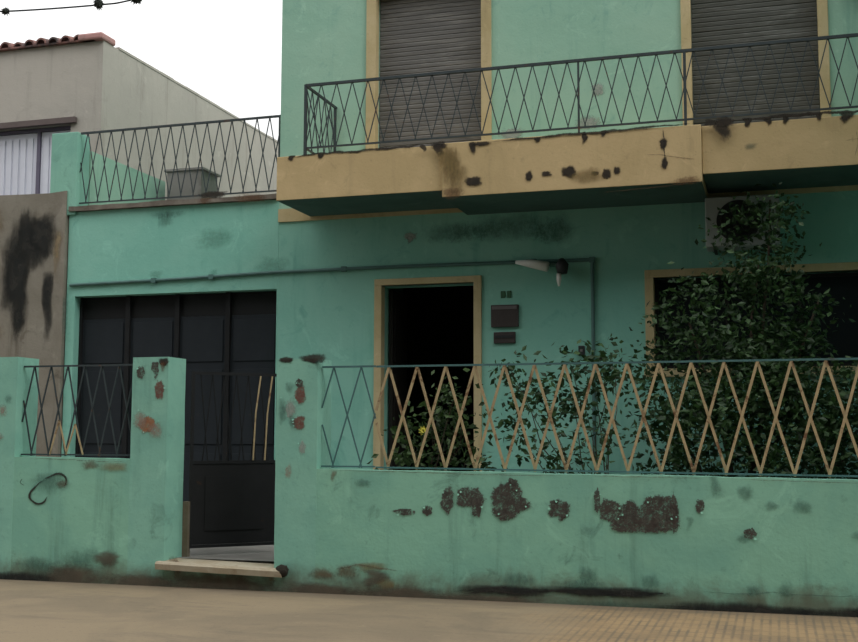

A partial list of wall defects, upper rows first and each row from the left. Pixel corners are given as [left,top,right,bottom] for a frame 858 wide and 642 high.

spalling [525,166,620,181]
damp [3,215,61,333]
peeling [393,478,531,521]
peeling [548,499,571,521]
peeling [594,488,680,533]